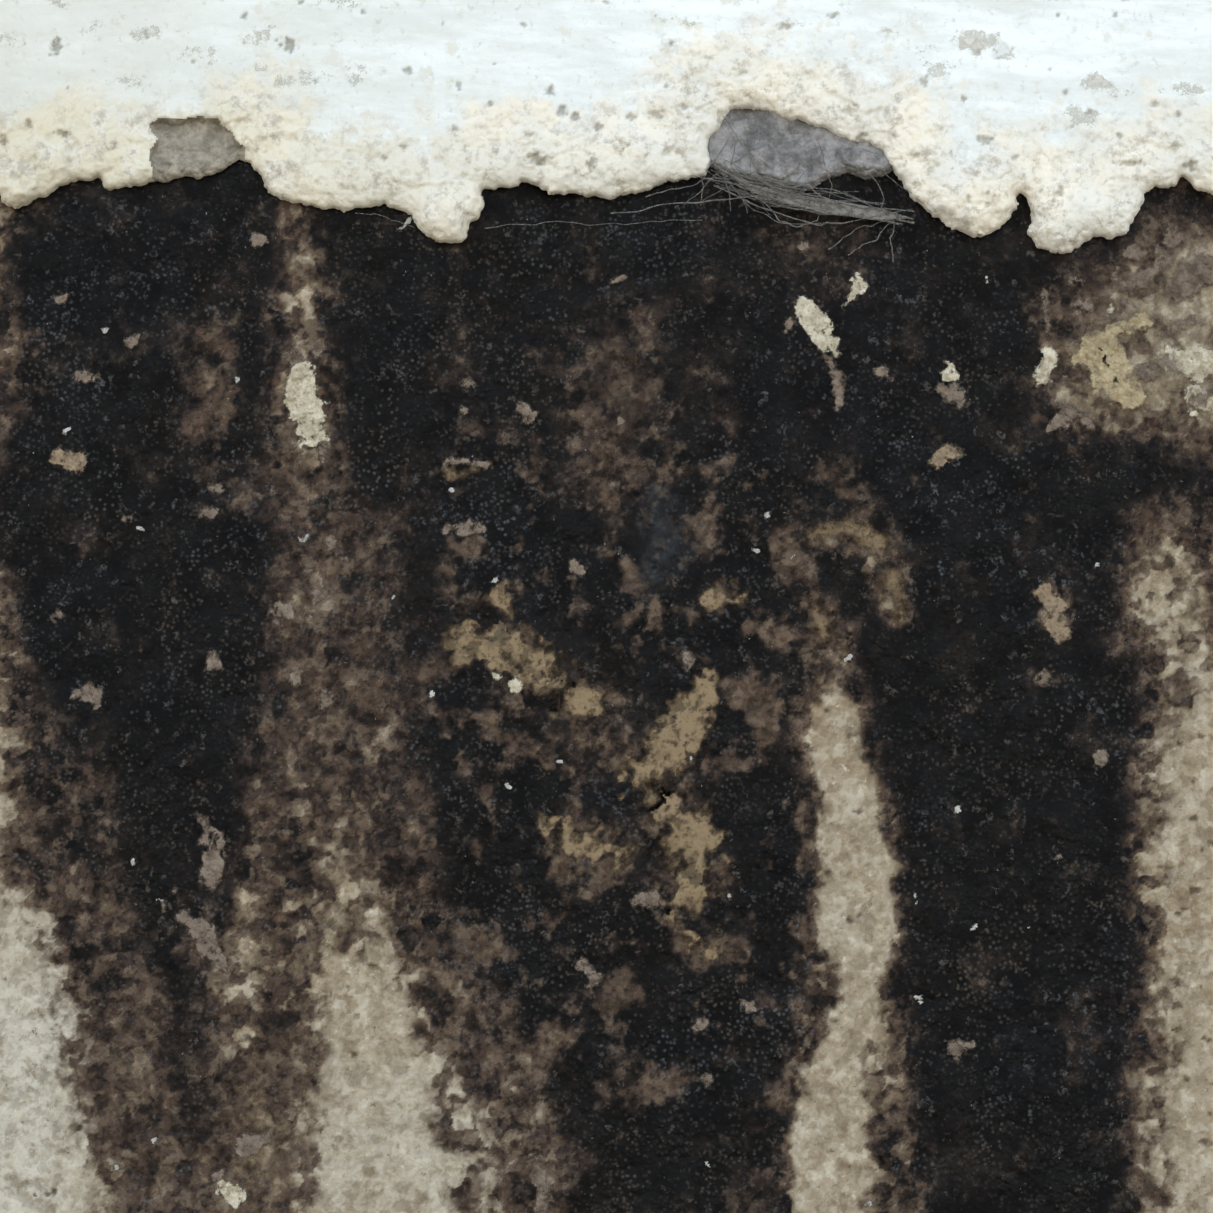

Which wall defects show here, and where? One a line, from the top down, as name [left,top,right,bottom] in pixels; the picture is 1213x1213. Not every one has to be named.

spalling [149,116,245,183]
spalling [708,109,894,192]
leakage [845,272,868,303]
leakage [1039,177,1213,397]
leakage [795,296,840,358]
leakage [283,348,331,463]
leakage [935,361,966,409]
leakage [642,485,695,591]
leakage [1071,389,1213,653]
leakage [507,678,523,693]
leakage [319,870,340,929]
leakage [211,1169,246,1209]